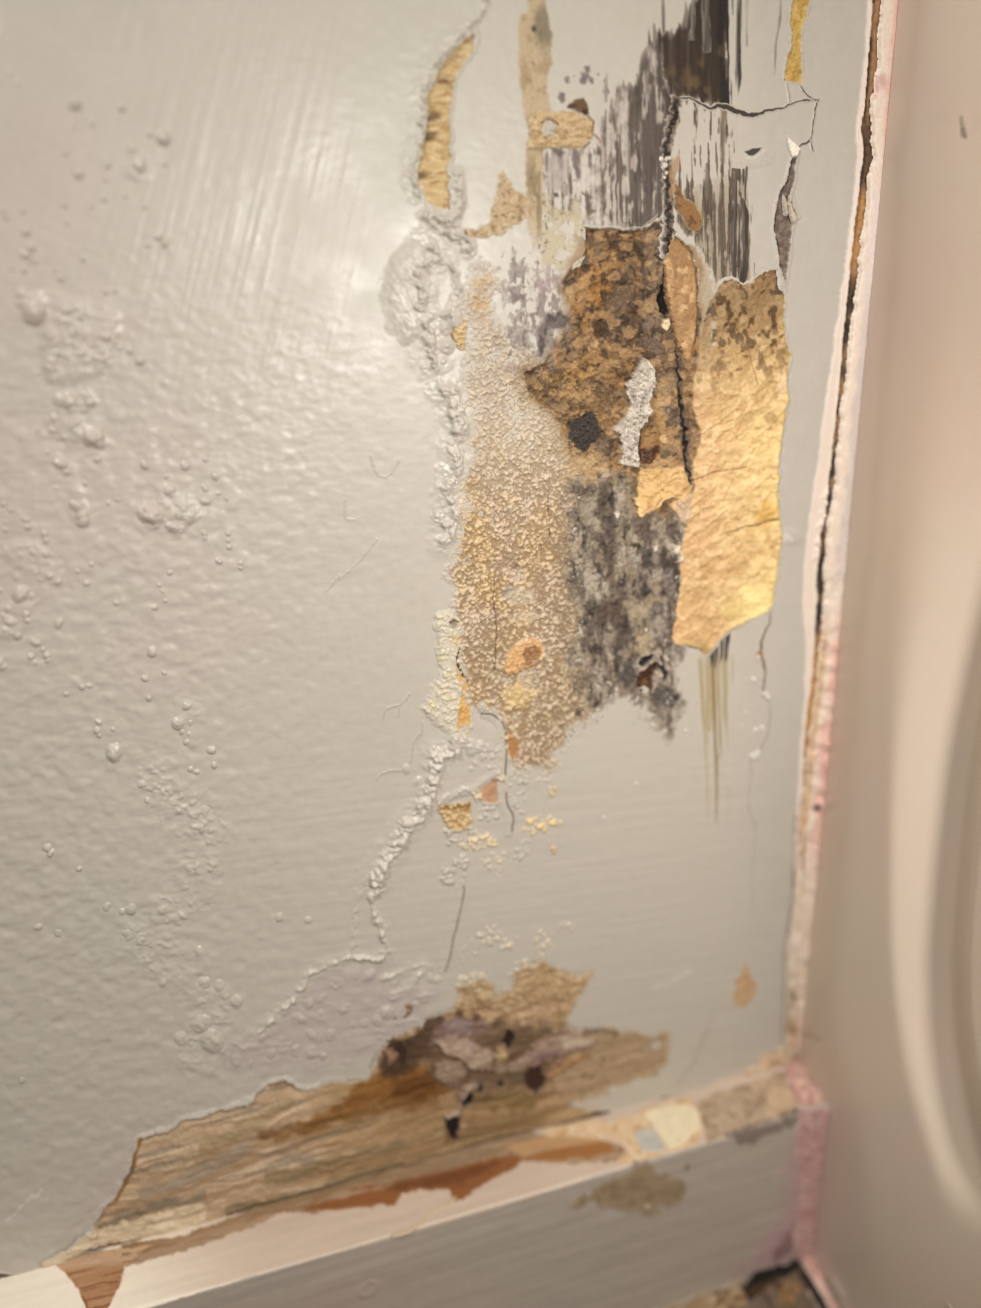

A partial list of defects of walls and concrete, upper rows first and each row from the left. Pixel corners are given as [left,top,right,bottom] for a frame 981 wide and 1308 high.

peeling [417,25,482,214]
flaking render [526,110,602,150]
peeling [450,318,467,351]
damp [437,0,773,887]
peeling [611,356,667,468]
spalling [656,286,670,315]
peeling [671,135,801,659]
peeling [781,0,874,1058]
crack [783,0,881,1057]
peeling [418,608,474,736]
peeling [436,770,509,833]
peeling [40,988,802,1308]